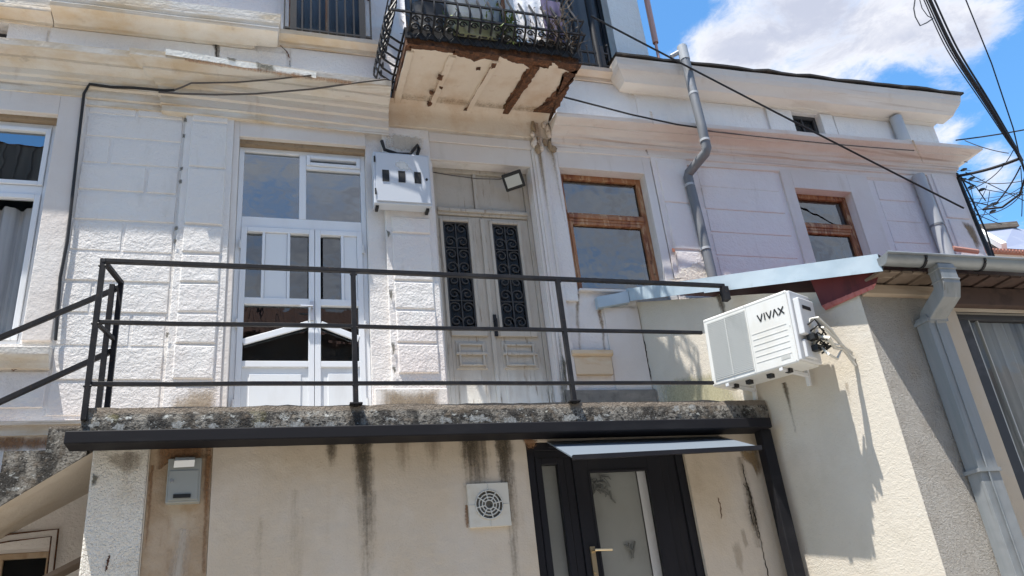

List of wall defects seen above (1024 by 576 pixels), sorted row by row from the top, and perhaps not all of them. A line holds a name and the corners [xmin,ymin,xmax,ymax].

spalling [395,43,582,172]
leakage [355,444,372,524]
leakage [464,440,511,482]
crack [742,464,769,576]